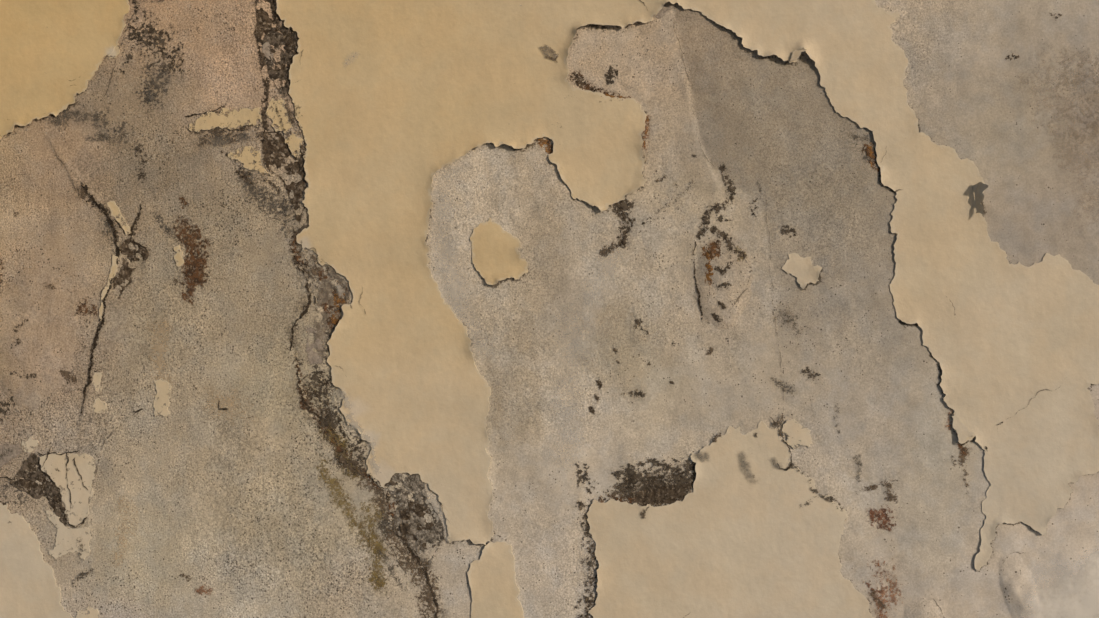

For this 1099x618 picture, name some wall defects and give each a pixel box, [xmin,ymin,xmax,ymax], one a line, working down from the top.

peeling [0,0,130,140]
crack [81,185,146,414]
corrosion [153,197,210,306]
crack [290,267,337,436]
peeling [188,0,1099,571]
corrosion [701,240,721,285]
peeling [0,436,101,618]
crack [395,528,439,618]
peeling [467,541,524,618]
peeling [587,419,874,618]
corrosion [870,505,896,531]
corrosion [866,558,903,618]